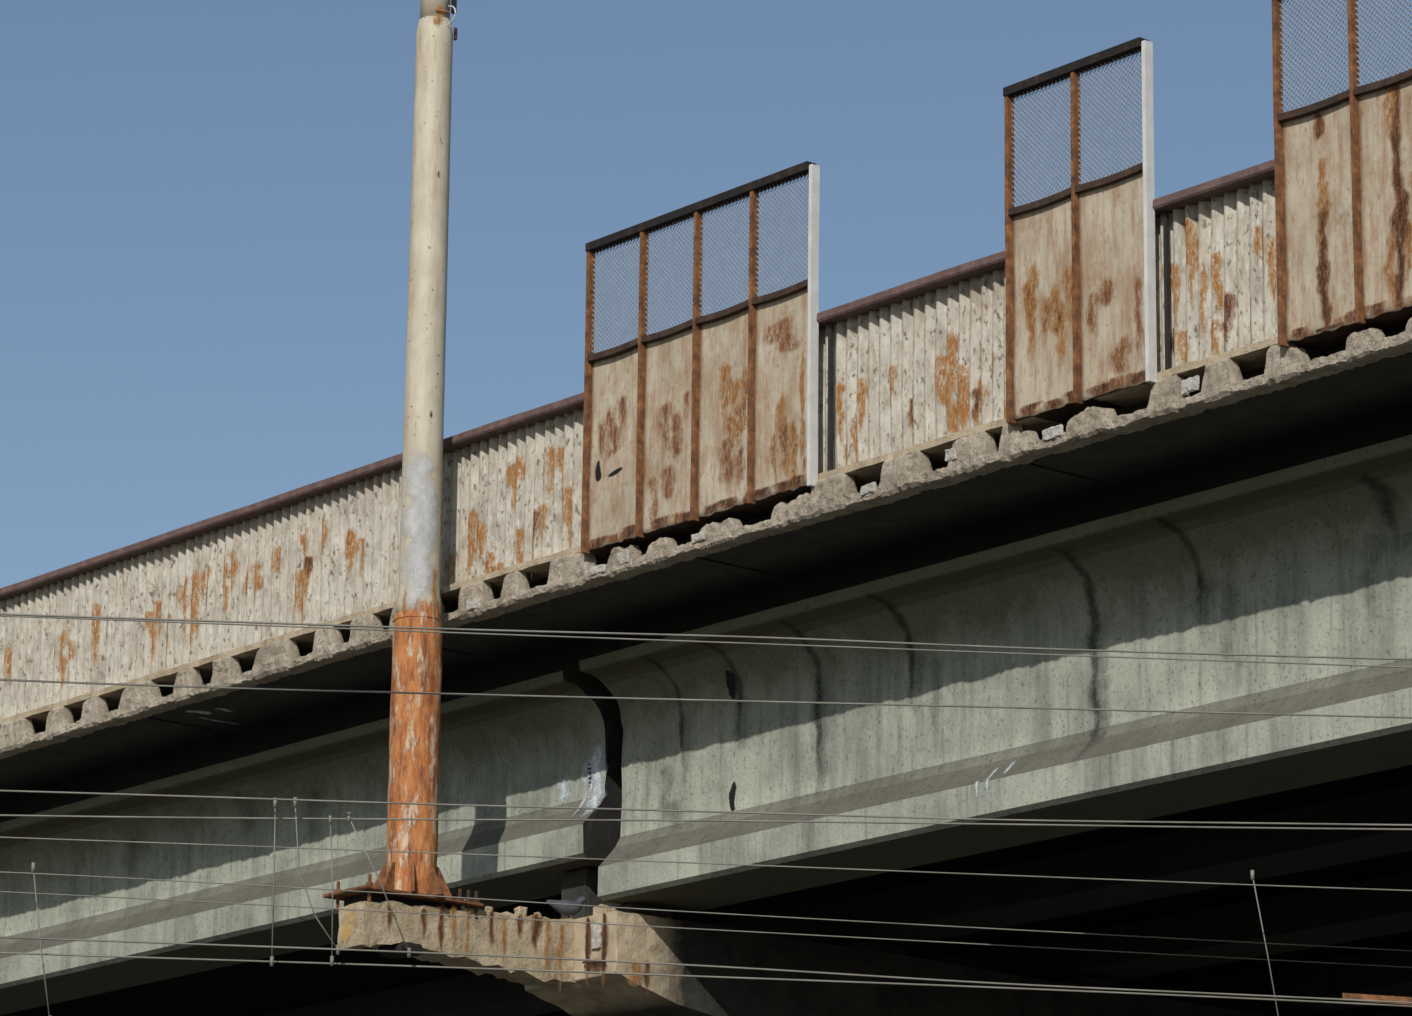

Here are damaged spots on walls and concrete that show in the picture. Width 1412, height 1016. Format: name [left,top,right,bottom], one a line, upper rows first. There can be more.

corrosion [589,318,806,549]
corrosion [836,378,868,480]
corrosion [935,334,995,433]
corrosion [1004,265,1146,418]
corrosion [1161,219,1251,379]
corrosion [1254,226,1276,299]
corrosion [1292,85,1412,338]
corrosion [91,603,108,660]
corrosion [145,517,327,668]
corrosion [345,530,364,576]
corrosion [393,447,572,641]
spalling [582,913,606,970]